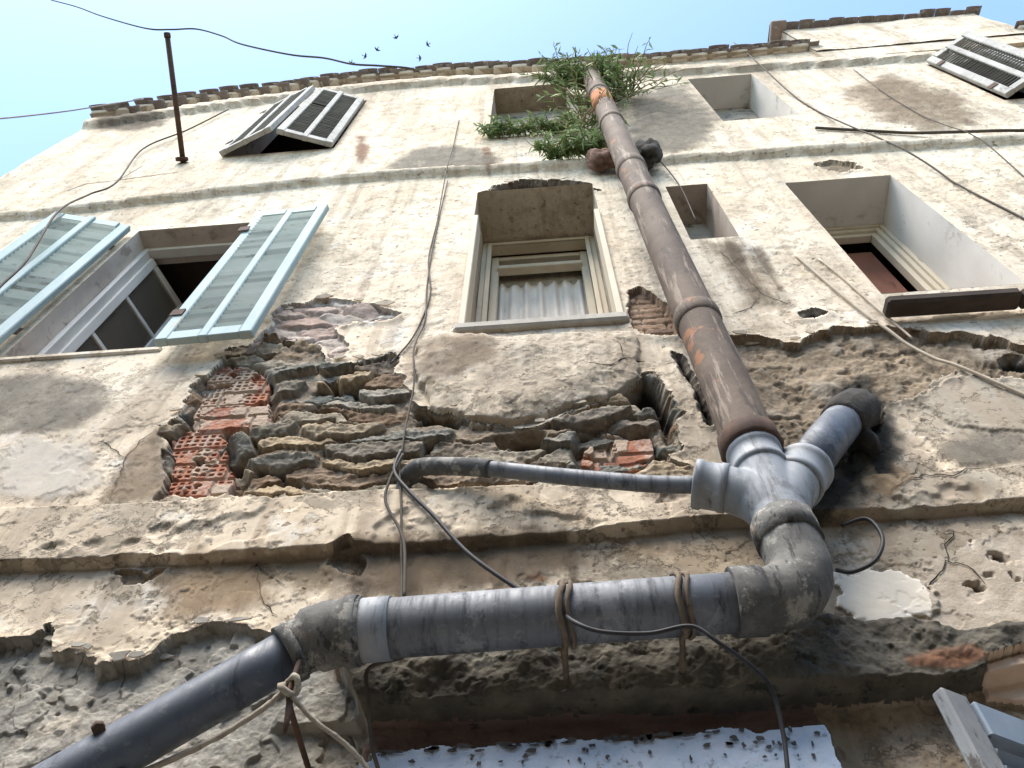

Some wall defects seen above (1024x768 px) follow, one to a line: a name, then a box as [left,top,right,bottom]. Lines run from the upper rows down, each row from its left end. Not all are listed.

water stain [851,76,973,130]
flaking render [814,159,864,173]
spalling [153,286,714,501]
spalling [730,307,1024,448]
water stain [812,374,909,526]
crack [239,564,283,616]
crack [927,532,984,589]
spalling [0,617,272,768]
spalling [144,667,820,768]
rust [907,645,985,666]
flaking render [982,642,1024,706]